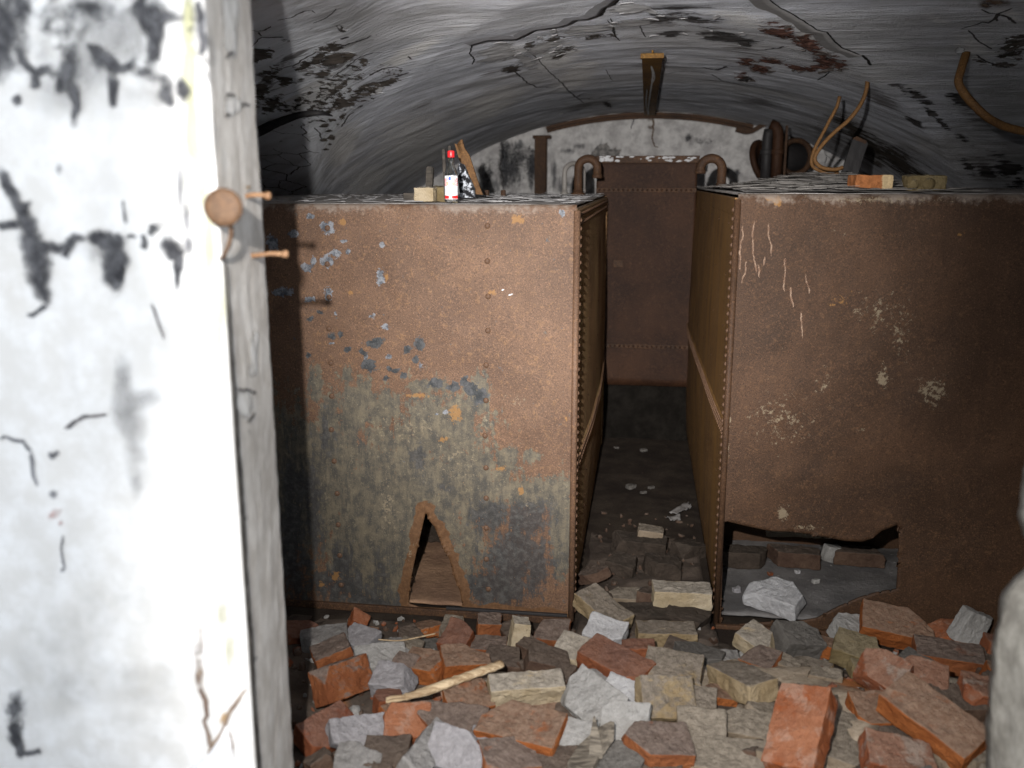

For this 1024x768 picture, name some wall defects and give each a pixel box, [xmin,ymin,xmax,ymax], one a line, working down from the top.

peeling [225,25,412,151]
crack [463,0,646,103]
peeling [972,34,1024,68]
corrosion [739,221,772,281]